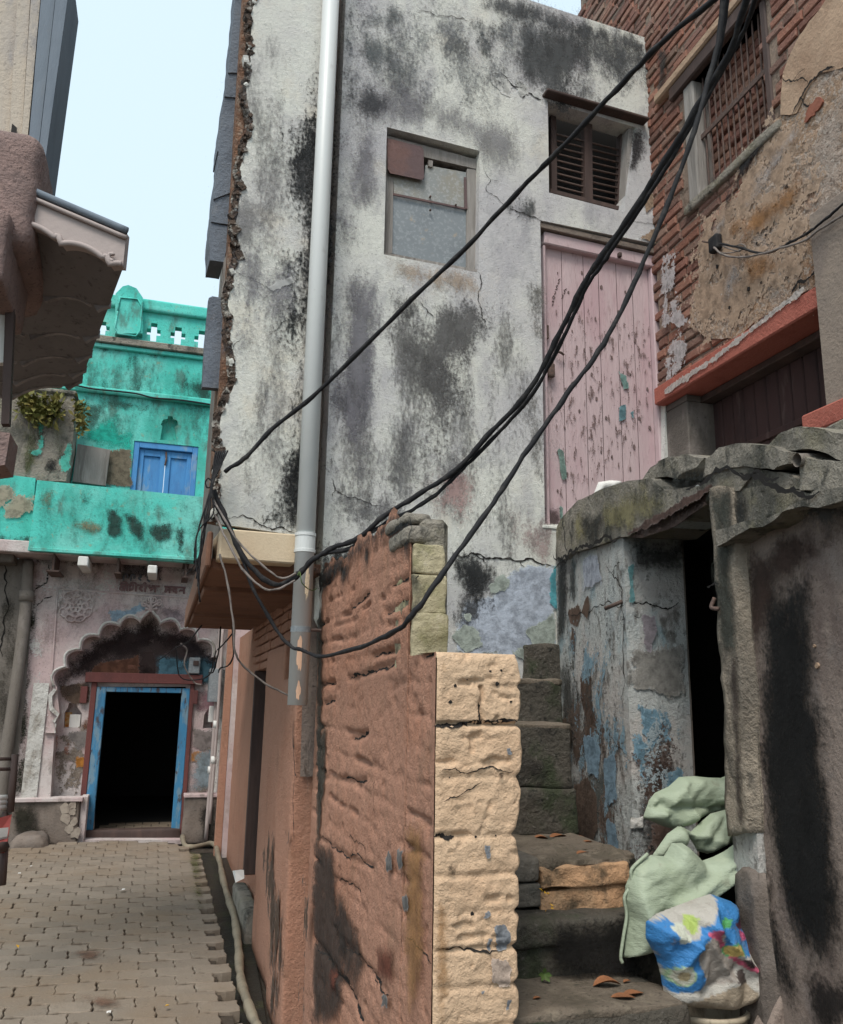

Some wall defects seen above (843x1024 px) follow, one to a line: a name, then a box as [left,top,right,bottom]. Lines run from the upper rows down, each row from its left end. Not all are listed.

water stain [341,0,667,160]
crack [782,66,835,114]
spalling [208,0,257,523]
water stain [237,77,318,356]
flaking render [667,97,827,349]
flaking render [0,432,52,519]
water stain [255,443,300,529]
water stain [331,278,544,551]
crack [439,766,511,802]
crack [460,519,678,702]
peeling [452,553,686,858]
water stain [747,507,843,997]